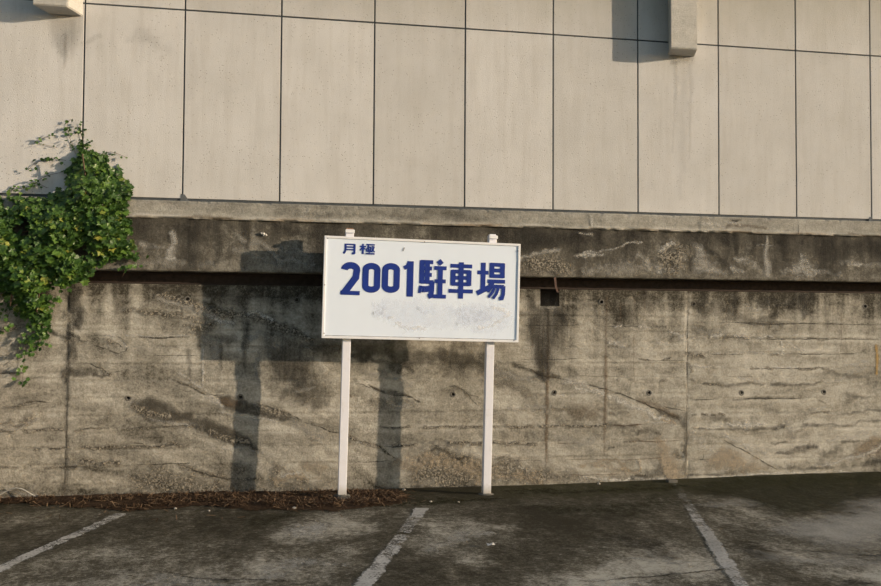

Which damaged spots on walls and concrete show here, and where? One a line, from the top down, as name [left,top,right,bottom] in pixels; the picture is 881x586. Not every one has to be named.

leakage [530,302,567,380]